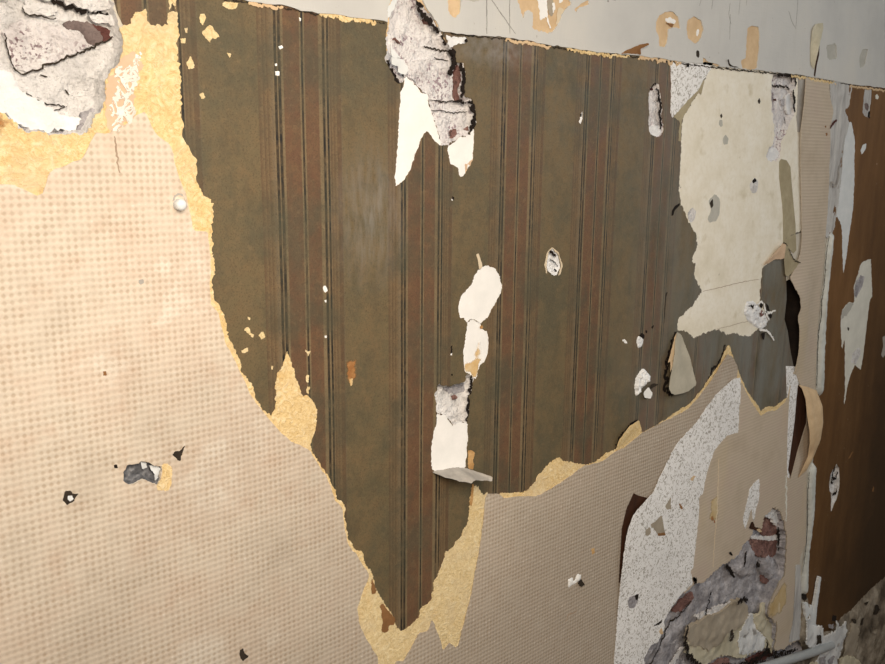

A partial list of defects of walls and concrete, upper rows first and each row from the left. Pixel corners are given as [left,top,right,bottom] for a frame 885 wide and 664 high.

spalling [0,0,123,135]
spalling [385,0,479,186]
spalling [648,83,663,137]
peeling [656,11,703,47]
spalling [862,89,879,118]
flaking render [677,26,802,366]
peeling [836,122,866,273]
flaking render [431,254,502,471]
peeling [841,259,872,404]